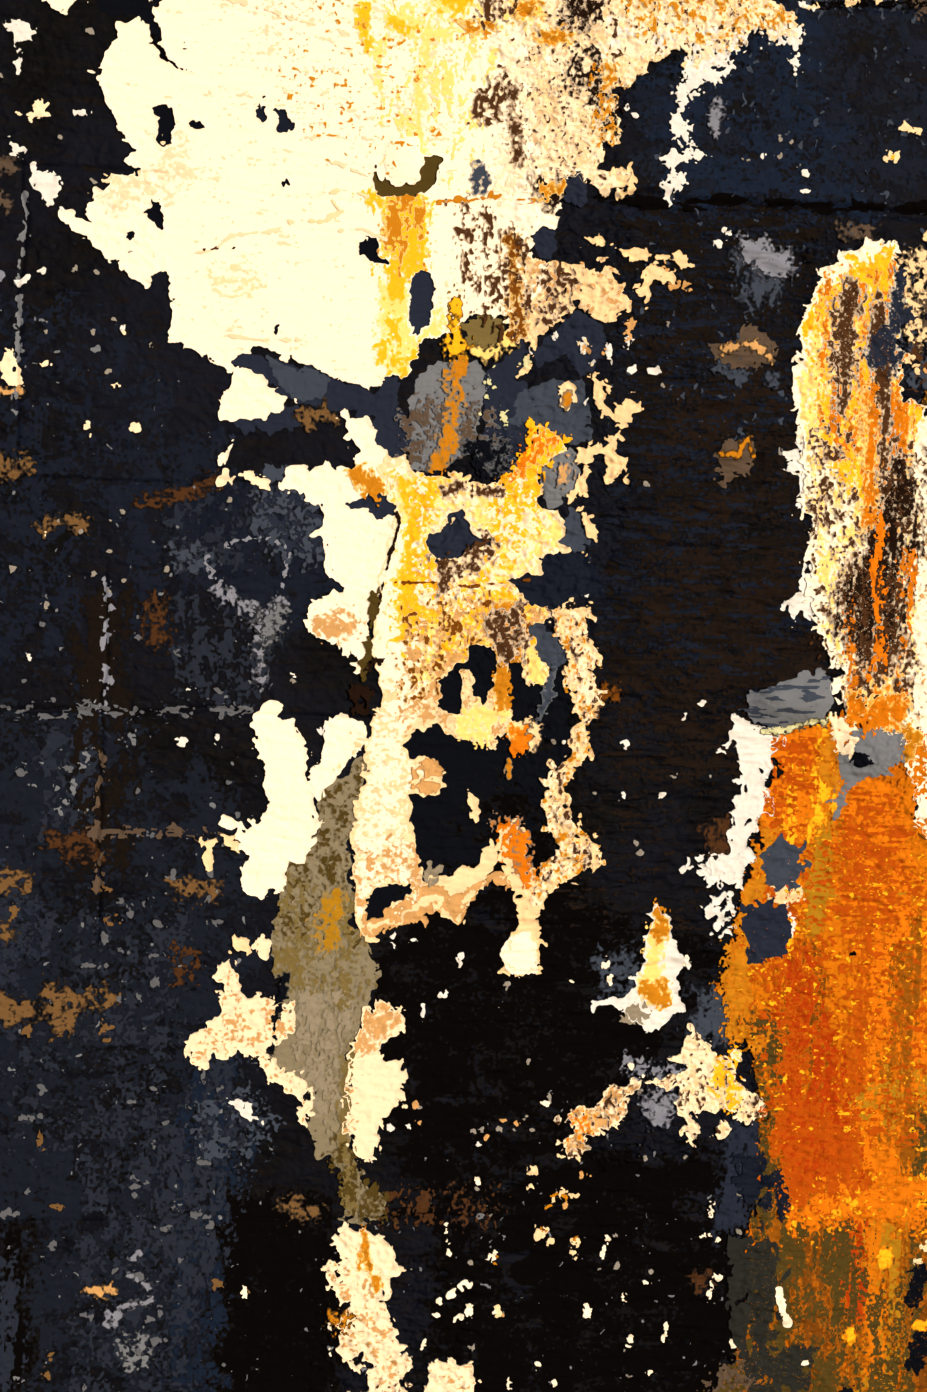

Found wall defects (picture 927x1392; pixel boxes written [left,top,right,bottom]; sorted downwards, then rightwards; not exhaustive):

peeling [96,0,187,70]
peeling [152,104,205,147]
peeling [256,96,295,133]
spalling [373,155,443,197]
peeling [143,199,164,230]
peeling [359,236,389,265]
peeling [533,226,557,260]
peeling [408,270,436,335]
peeling [228,310,607,1226]
spalling [849,752,875,768]
peeling [738,833,812,964]
spalling [619,999,652,1025]